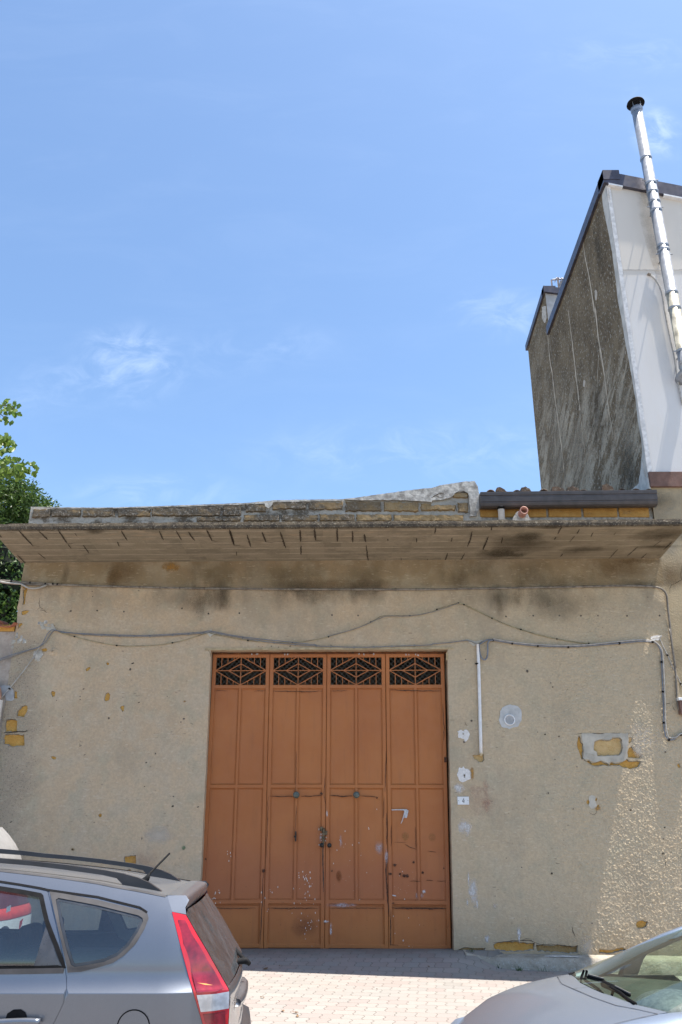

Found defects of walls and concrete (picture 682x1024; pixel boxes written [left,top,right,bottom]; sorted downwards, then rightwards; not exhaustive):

spalling [3,691,28,747]
spalling [576,736,642,769]
spalling [459,941,578,954]